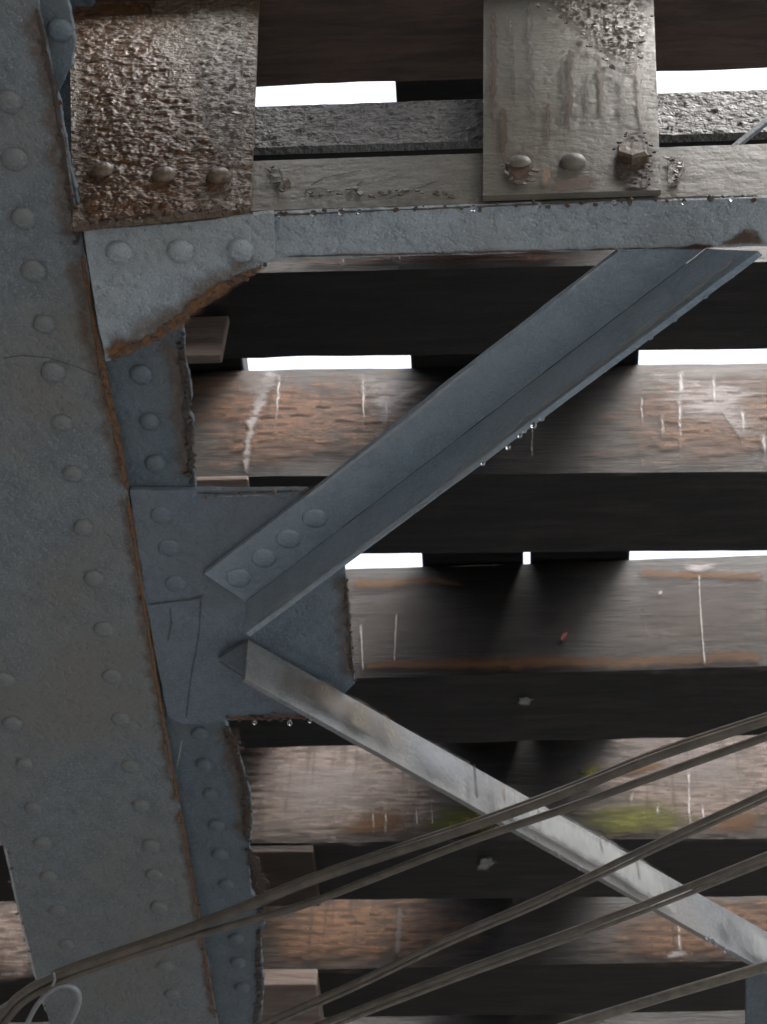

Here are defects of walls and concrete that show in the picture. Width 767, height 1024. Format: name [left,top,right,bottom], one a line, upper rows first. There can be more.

peeling [536,0,654,73]
corrosion [274,131,757,217]
corrosion [32,1,314,919]
water stain [202,372,427,469]
water stain [606,370,767,464]
corrosion [224,714,306,1024]